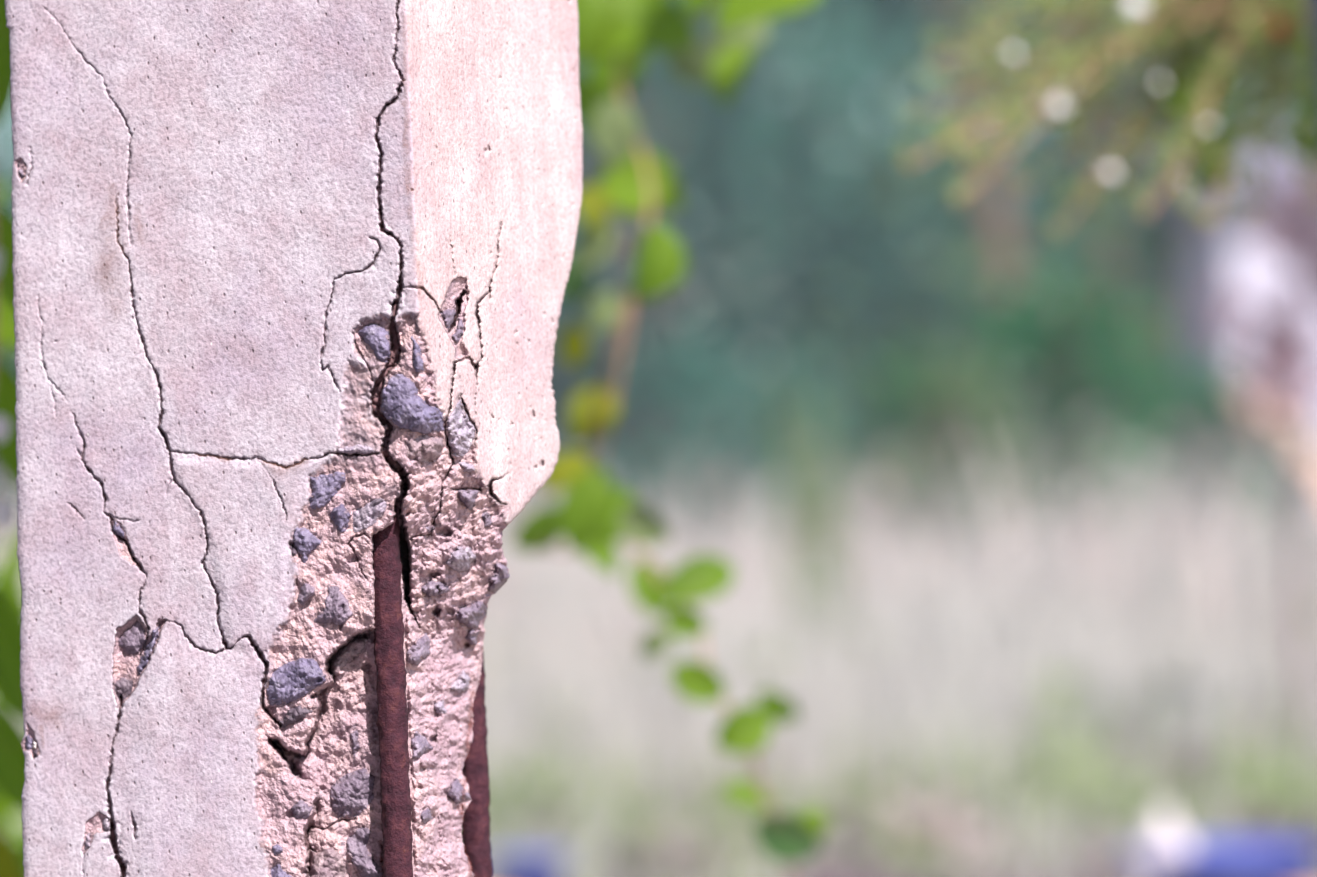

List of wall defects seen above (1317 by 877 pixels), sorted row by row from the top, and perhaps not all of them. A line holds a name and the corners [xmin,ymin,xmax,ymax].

crack [276,1,501,615]
spalling [438,277,469,360]
crack [82,442,149,653]
crack [117,208,372,760]
spalling [255,315,510,877]
crack [106,696,135,877]
crack [305,819,346,851]